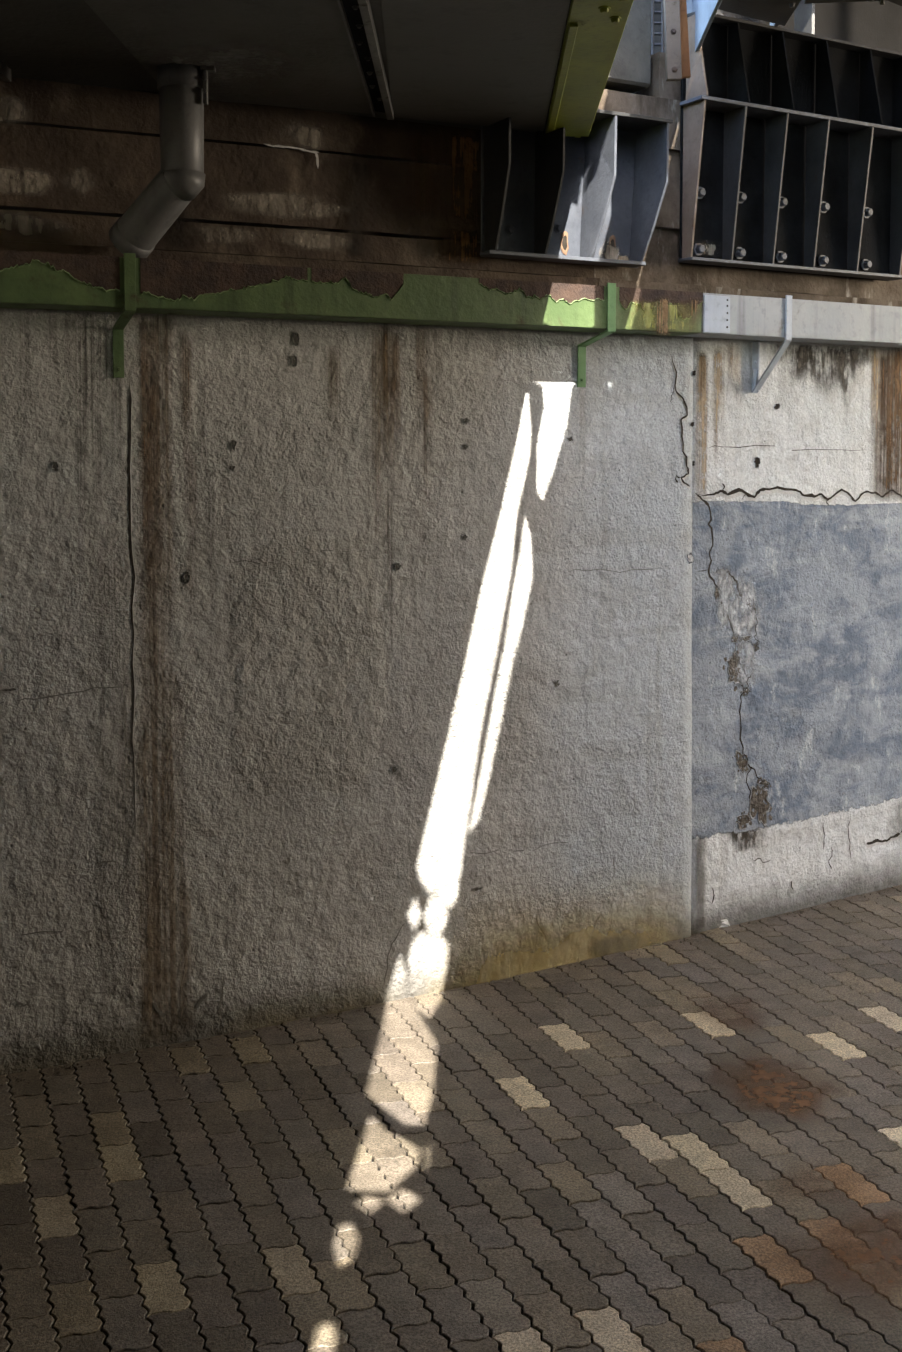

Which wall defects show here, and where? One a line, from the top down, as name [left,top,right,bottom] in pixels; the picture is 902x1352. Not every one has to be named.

peeling [0,250,120,292]
peeling [140,258,404,302]
rust [697,348,733,489]
rust [873,349,902,496]
crack [569,353,902,806]
flaking render [722,633,759,696]
flaking render [734,750,773,830]
crack [866,831,902,848]